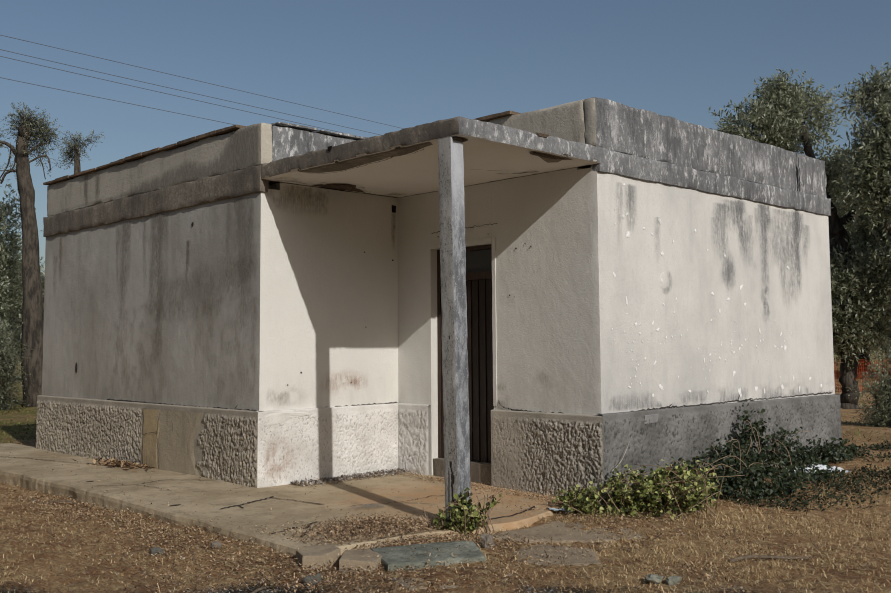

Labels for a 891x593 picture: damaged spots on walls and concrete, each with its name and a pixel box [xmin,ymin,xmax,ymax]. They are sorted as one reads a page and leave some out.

spalling [299,142,433,193]
spalling [529,151,572,163]